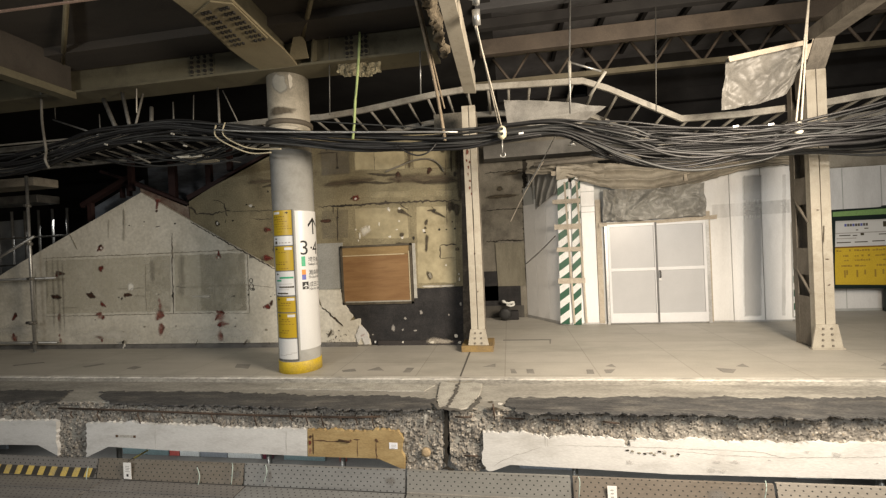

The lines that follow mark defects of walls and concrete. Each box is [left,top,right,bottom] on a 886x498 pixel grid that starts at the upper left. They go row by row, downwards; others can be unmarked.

spalling [421,0,450,59]
crack [43,200,275,317]
flaking render [319,289,376,345]
spalling [427,334,461,344]
spalling [0,401,886,471]
crack [431,381,482,471]